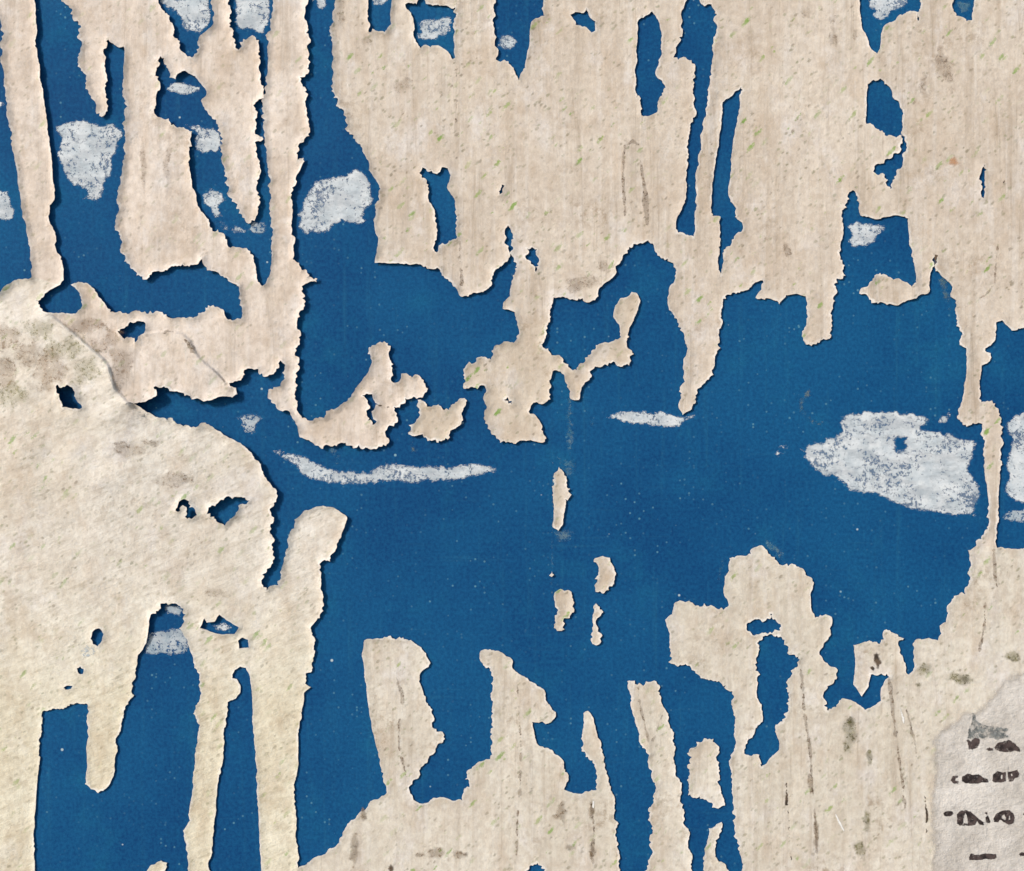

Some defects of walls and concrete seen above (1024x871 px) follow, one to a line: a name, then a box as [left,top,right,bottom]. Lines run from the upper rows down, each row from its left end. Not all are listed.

peeling [0,0,467,449]
peeling [298,0,1024,871]
peeling [147,860,167,871]